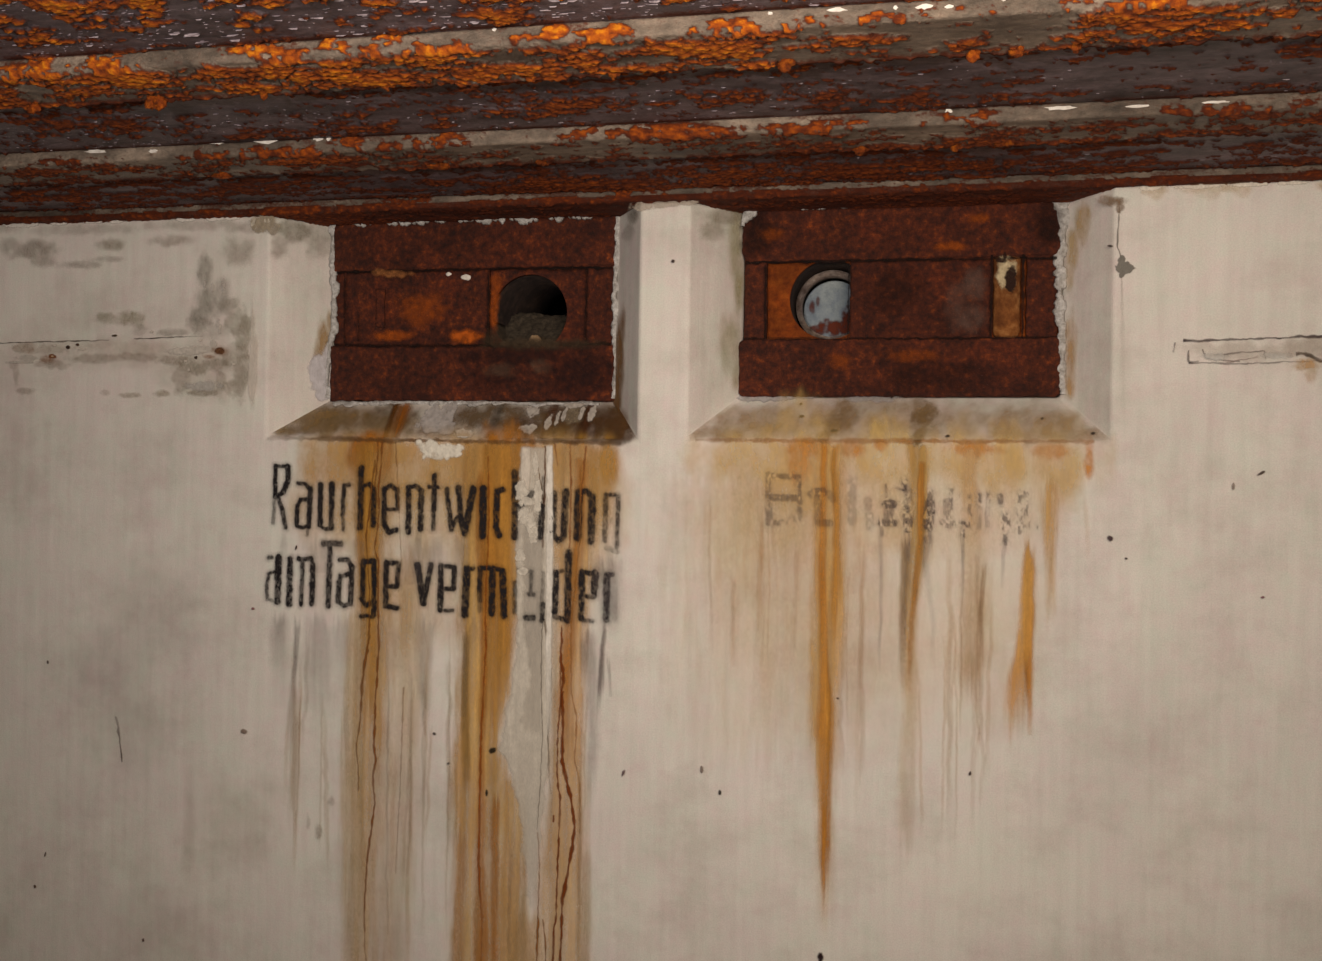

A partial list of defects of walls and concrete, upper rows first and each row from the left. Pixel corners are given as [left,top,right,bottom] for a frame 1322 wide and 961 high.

peeling [3,0,246,55]
peeling [274,0,673,36]
rust [376,269,405,278]
rust [810,298,850,336]
crack [356,441,397,929]
rust [306,316,632,961]
rust [761,404,938,886]
rust [1011,544,1034,707]
crack [536,573,577,961]